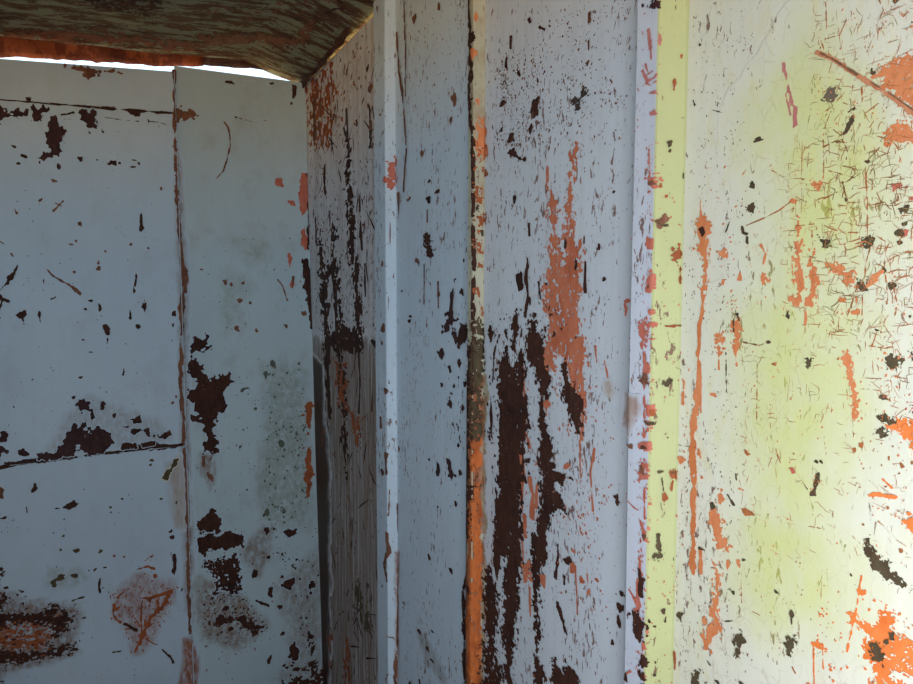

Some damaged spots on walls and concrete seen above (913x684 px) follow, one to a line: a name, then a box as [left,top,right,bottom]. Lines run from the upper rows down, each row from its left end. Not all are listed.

peeling [0,567,85,684]
peeling [0,69,265,664]
corrosion [36,143,275,684]
corrosion [175,105,199,123]
corrosion [236,45,378,684]
corrosion [392,550,401,684]
corrosion [461,0,490,684]
peeling [428,141,692,684]
peeling [782,610,798,658]
crack [710,0,913,678]
peeling [807,573,913,684]
peeling [879,350,913,400]